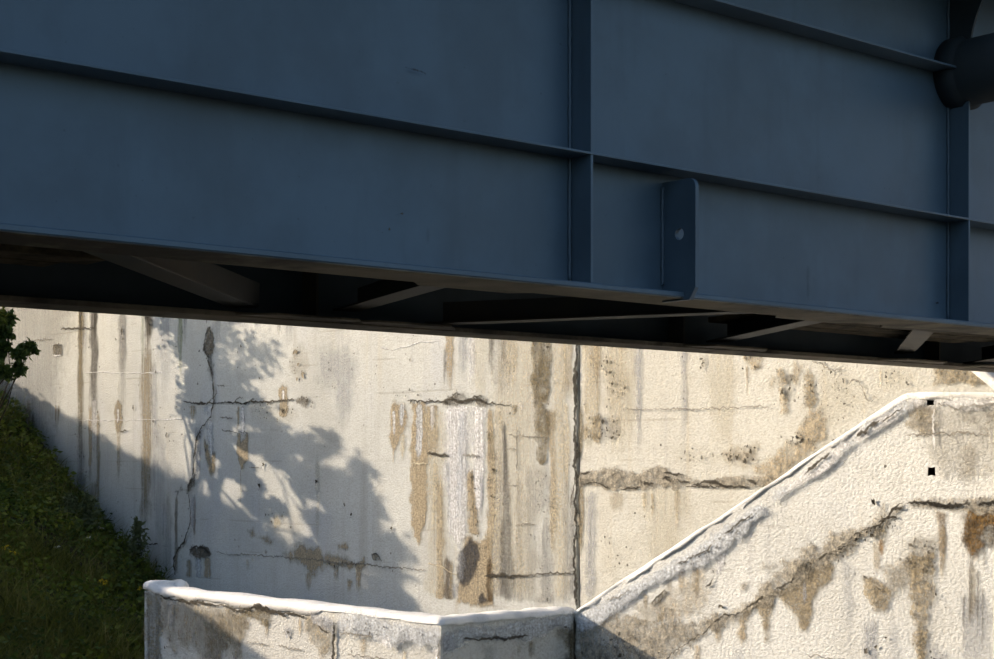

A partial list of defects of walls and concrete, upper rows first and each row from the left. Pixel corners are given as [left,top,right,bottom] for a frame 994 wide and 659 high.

leakage [75,312,100,492]
crack [148,360,293,574]
crack [160,595,304,618]
leakage [389,402,518,607]
spalling [395,388,523,414]
crack [485,345,584,659]
peeling [311,506,765,659]
spalling [578,369,922,501]
leakage [738,563,833,640]
spalling [707,499,899,632]
crack [666,497,994,659]
leakage [863,552,935,659]